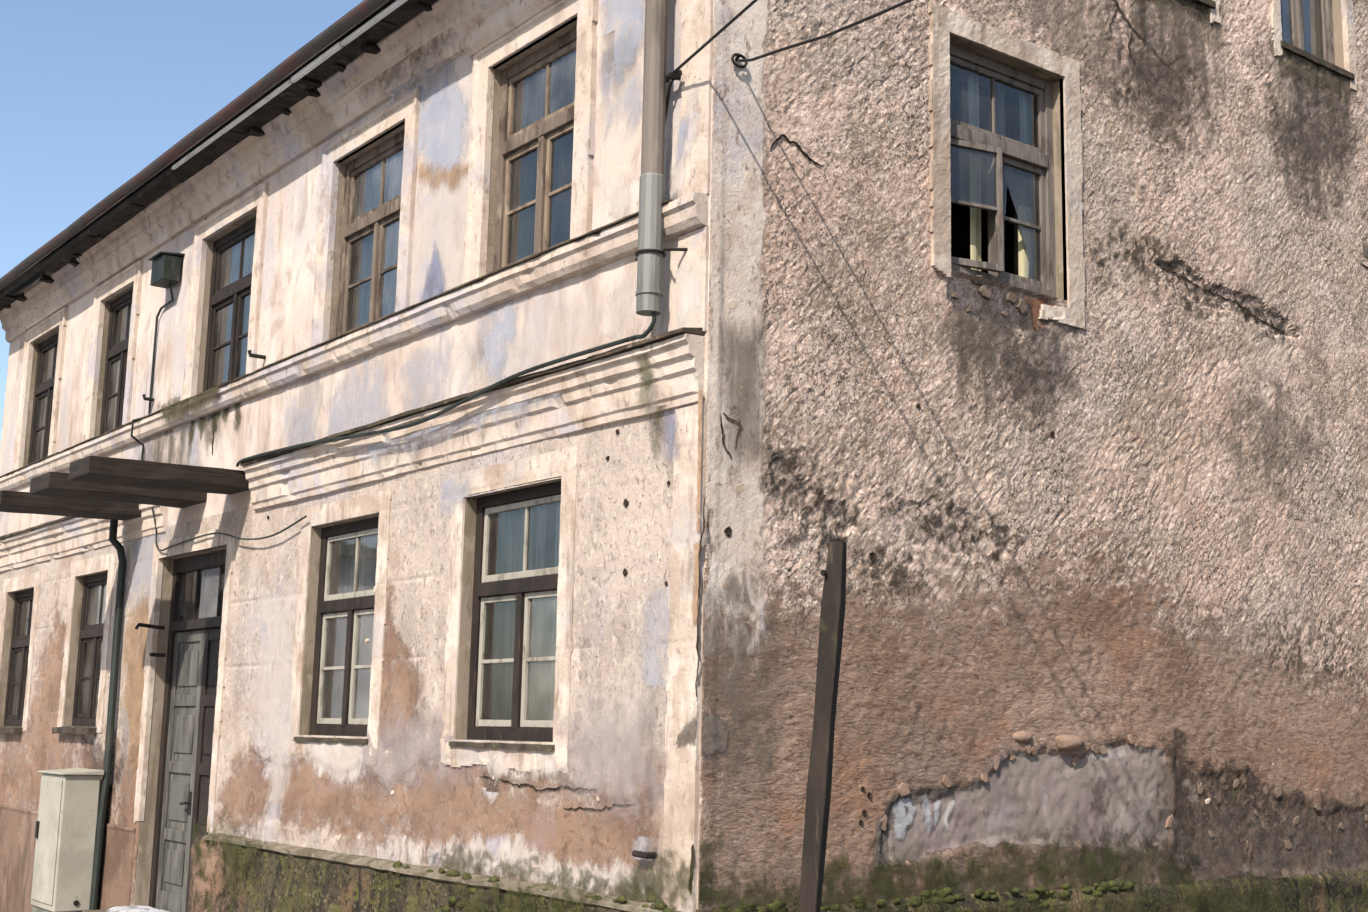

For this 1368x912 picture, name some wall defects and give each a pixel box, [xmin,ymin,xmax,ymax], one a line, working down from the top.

peeling [413,62,467,186]
crack [770,134,824,168]
spalling [951,275,1041,328]
spalling [1090,219,1301,338]
water stain [189,402,241,447]
crack [720,412,743,460]
peeling [667,0,860,910]
water stain [848,542,936,594]
peeling [0,602,148,909]
peeling [216,586,661,895]
peeling [821,478,1368,903]